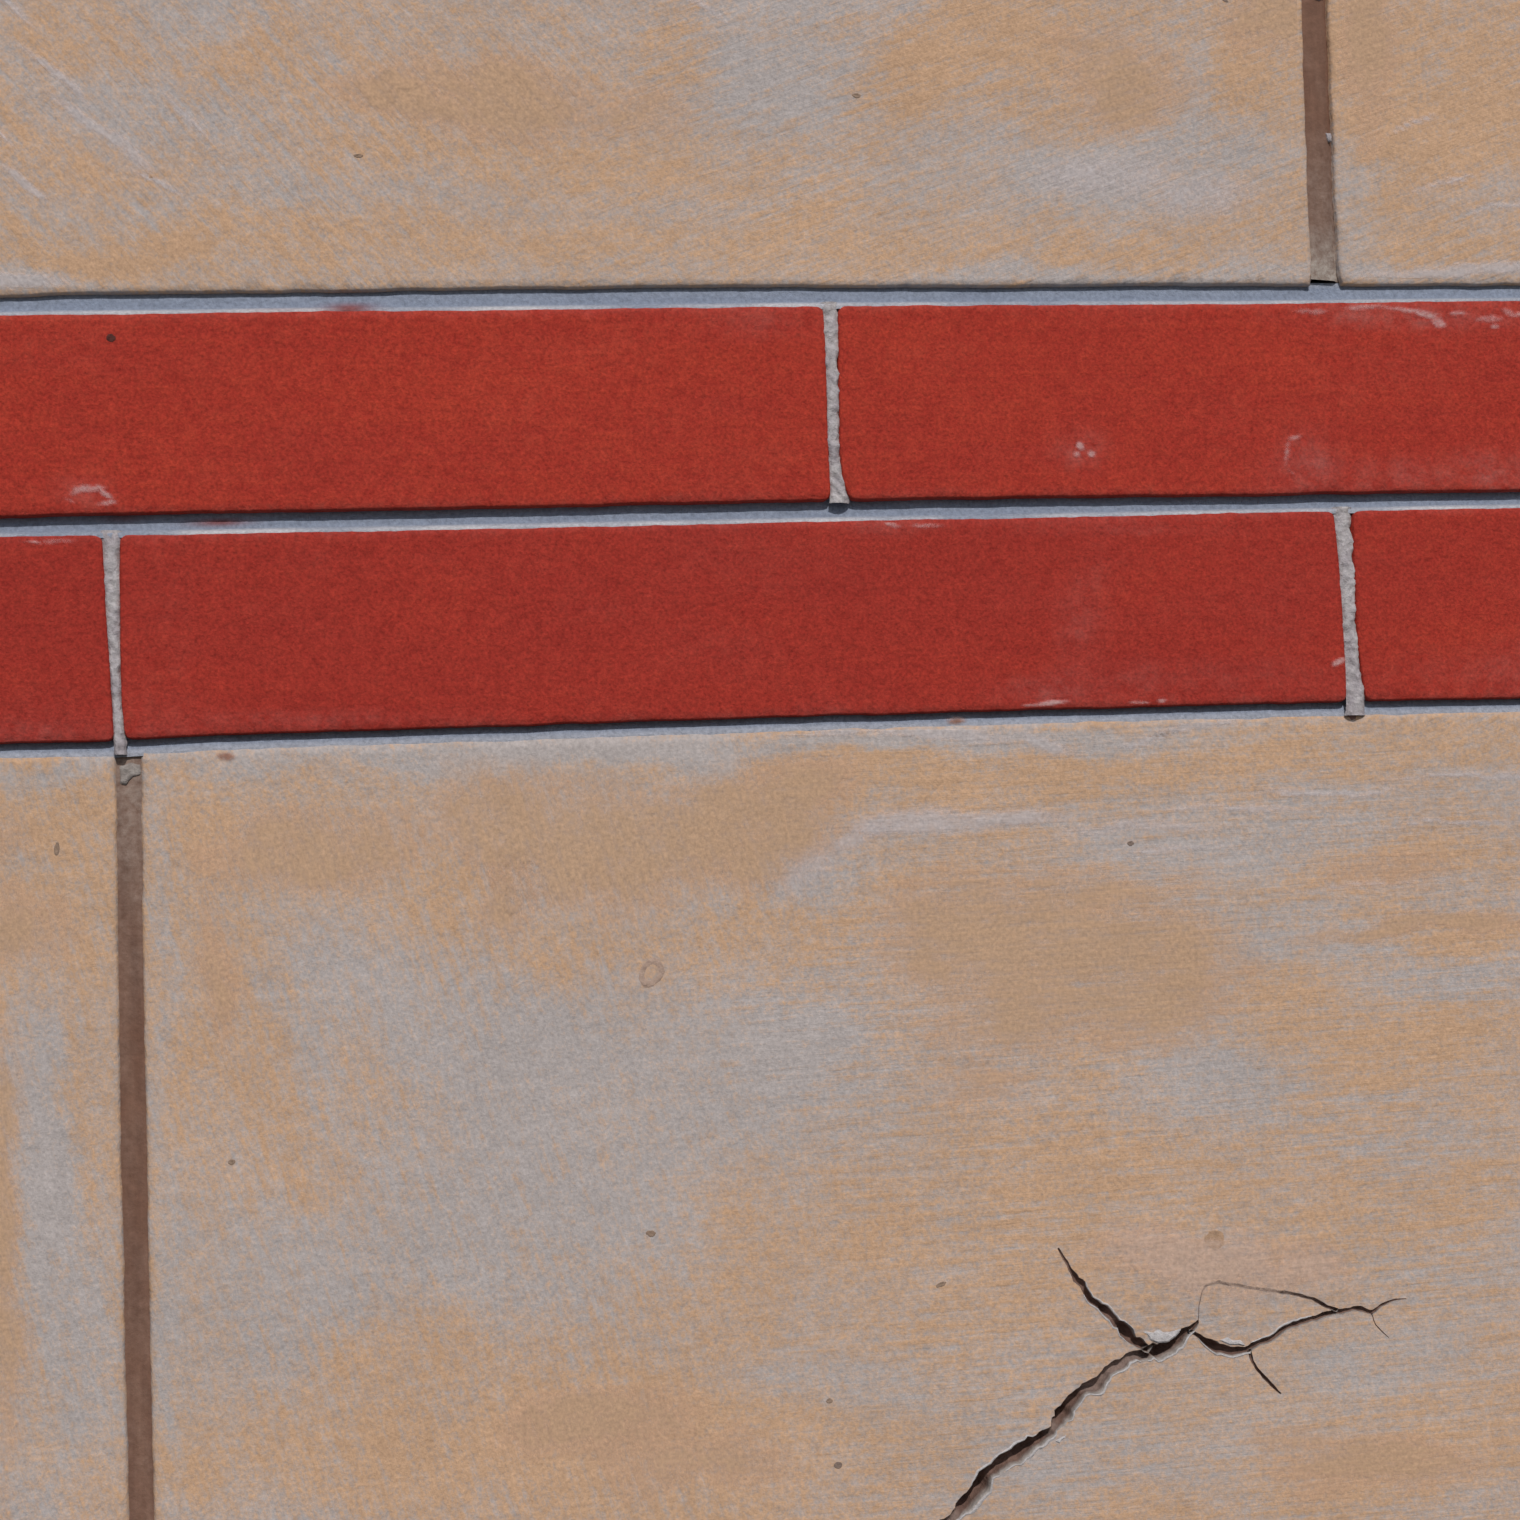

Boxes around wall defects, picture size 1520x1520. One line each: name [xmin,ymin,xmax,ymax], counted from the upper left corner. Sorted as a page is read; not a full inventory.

crack [940,1248,1407,1520]